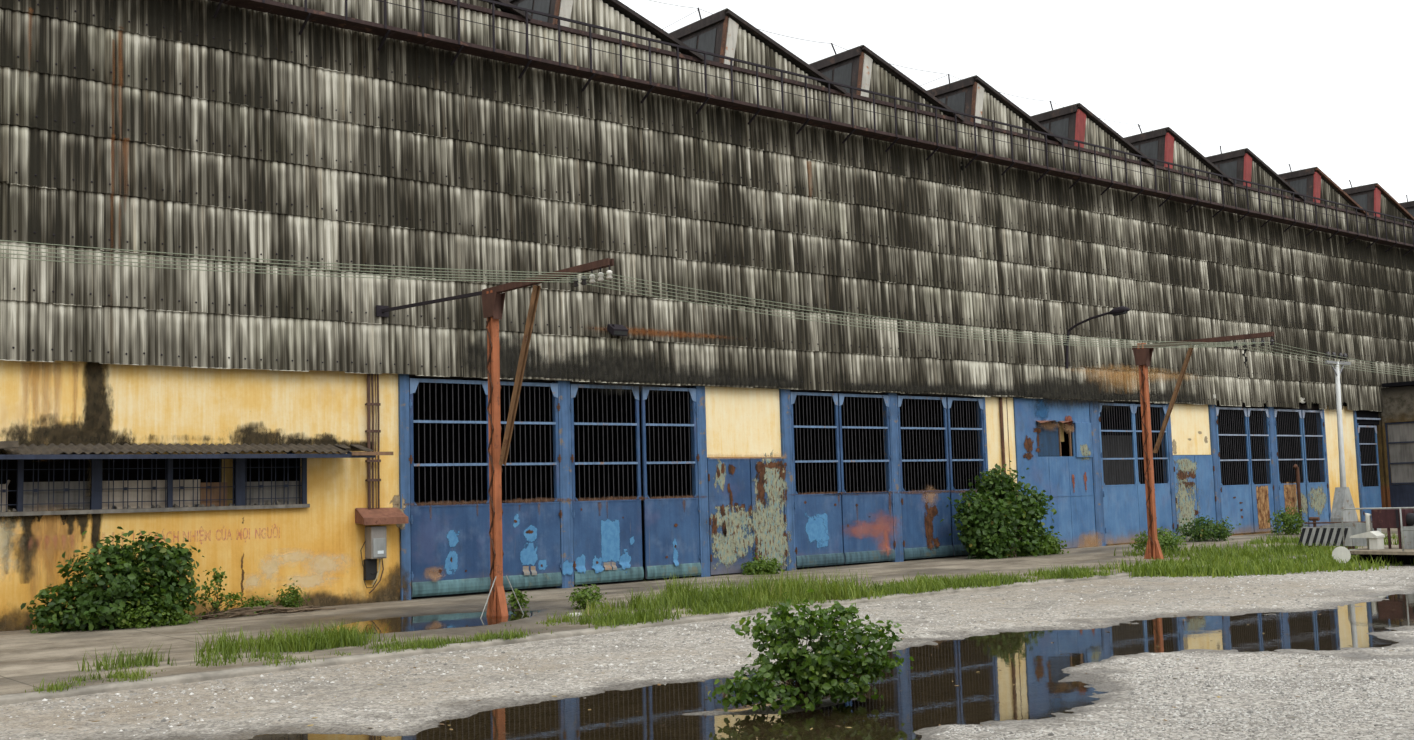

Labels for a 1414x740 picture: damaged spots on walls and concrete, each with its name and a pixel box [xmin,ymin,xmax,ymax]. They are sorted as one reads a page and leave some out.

damp [0,362,372,583]
peeling [438,530,467,575]
peeling [706,452,829,572]
peeling [1172,431,1208,540]